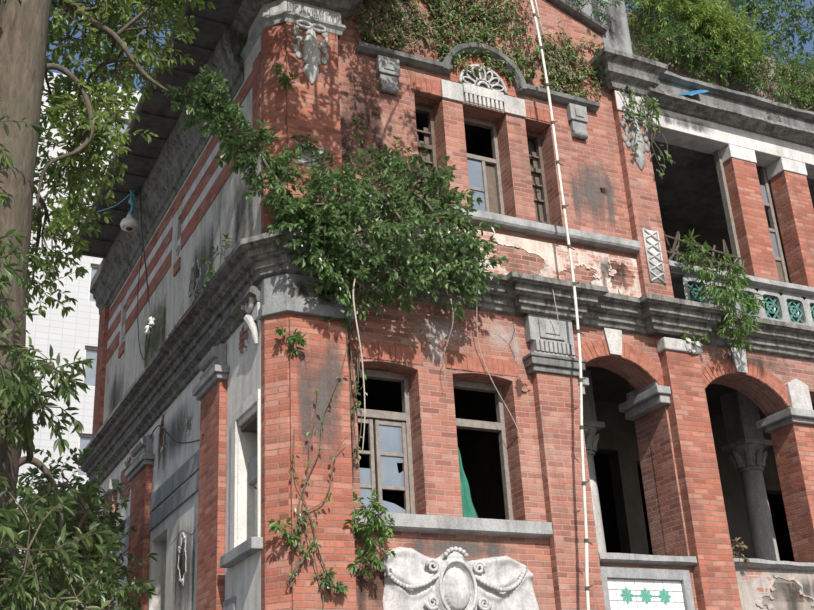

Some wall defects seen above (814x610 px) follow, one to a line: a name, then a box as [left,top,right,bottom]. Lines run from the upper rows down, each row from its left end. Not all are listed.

damp [573,168,613,215]
flaking render [466,242,636,294]
damp [300,356,340,439]
spalling [755,574,814,610]